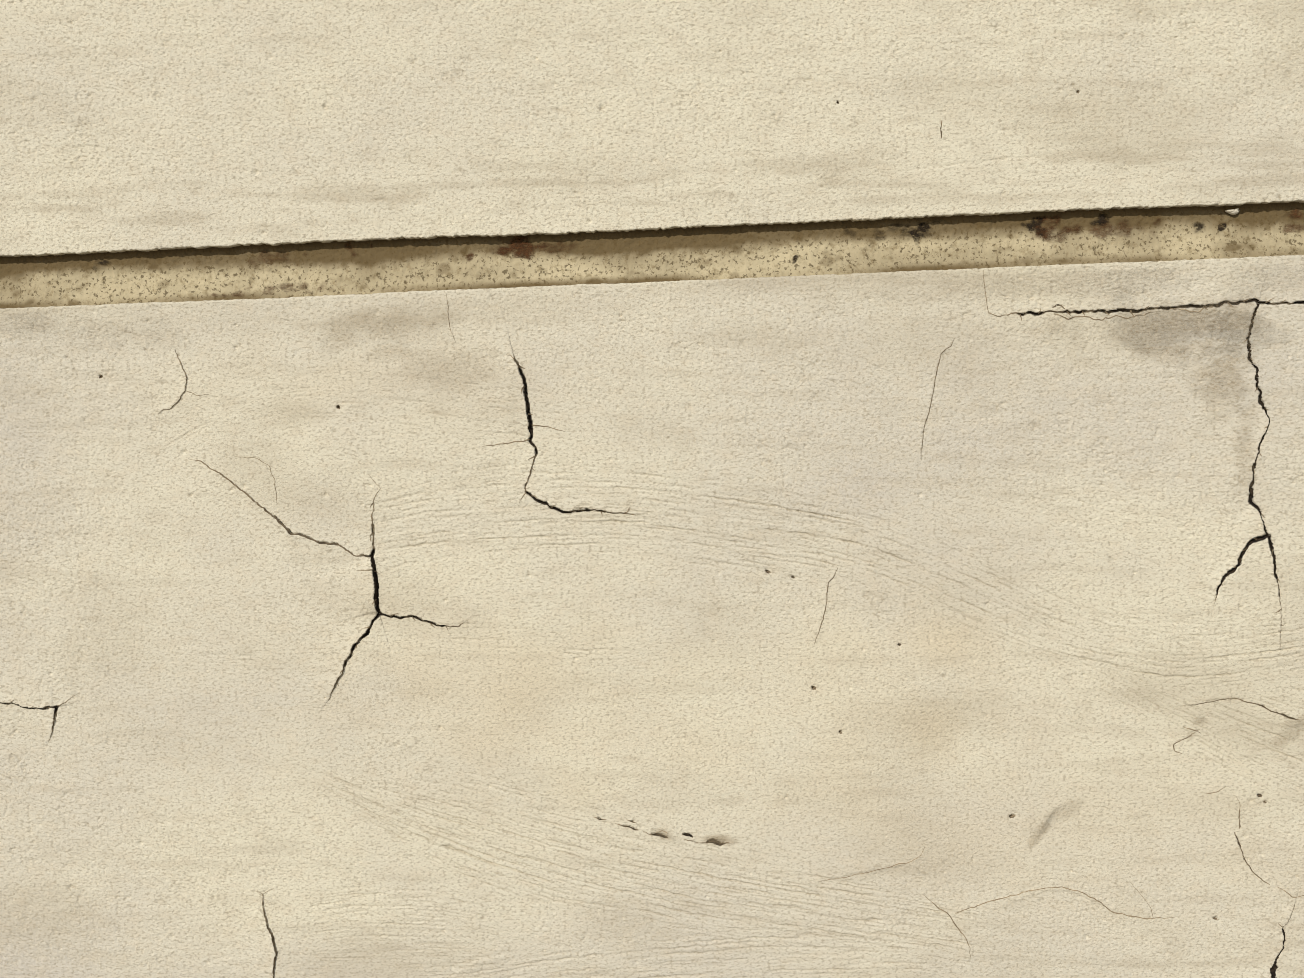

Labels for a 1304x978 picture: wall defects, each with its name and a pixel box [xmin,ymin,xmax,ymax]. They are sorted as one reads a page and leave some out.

crack [486,354,634,515]
crack [983,270,1304,645]
crack [191,456,463,699]
crack [2,693,78,740]
crack [1207,786,1304,978]